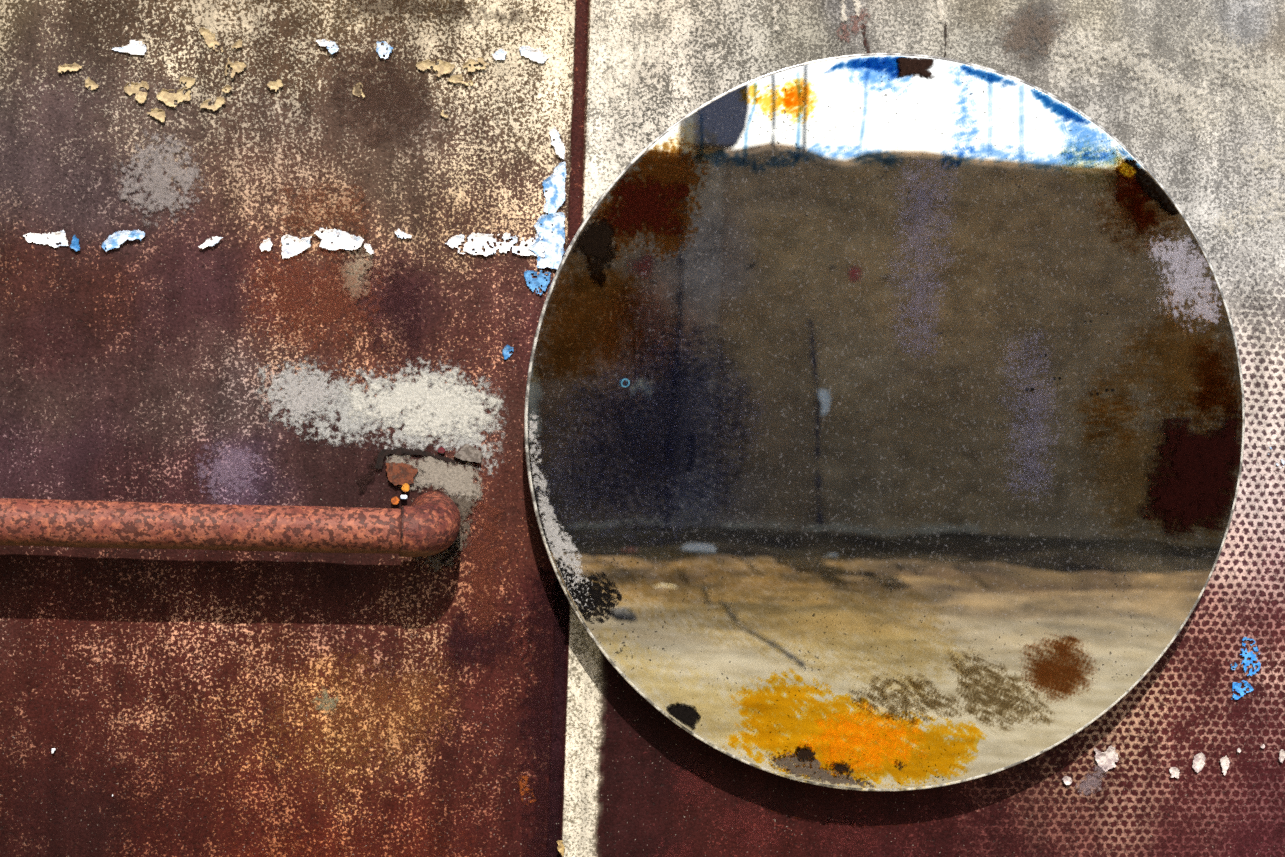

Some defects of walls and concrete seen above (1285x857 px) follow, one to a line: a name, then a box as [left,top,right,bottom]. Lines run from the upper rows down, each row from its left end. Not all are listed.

peeling [112,40,146,55]
peeling [316,39,339,54]
peeling [376,41,393,59]
peeling [58,62,99,90]
peeling [124,28,247,122]
peeling [267,79,283,92]
peeling [416,46,549,86]
peeling [445,127,567,295]
peeling [23,230,80,251]
peeling [101,229,145,252]
peeling [198,236,223,249]
peeling [260,227,374,259]